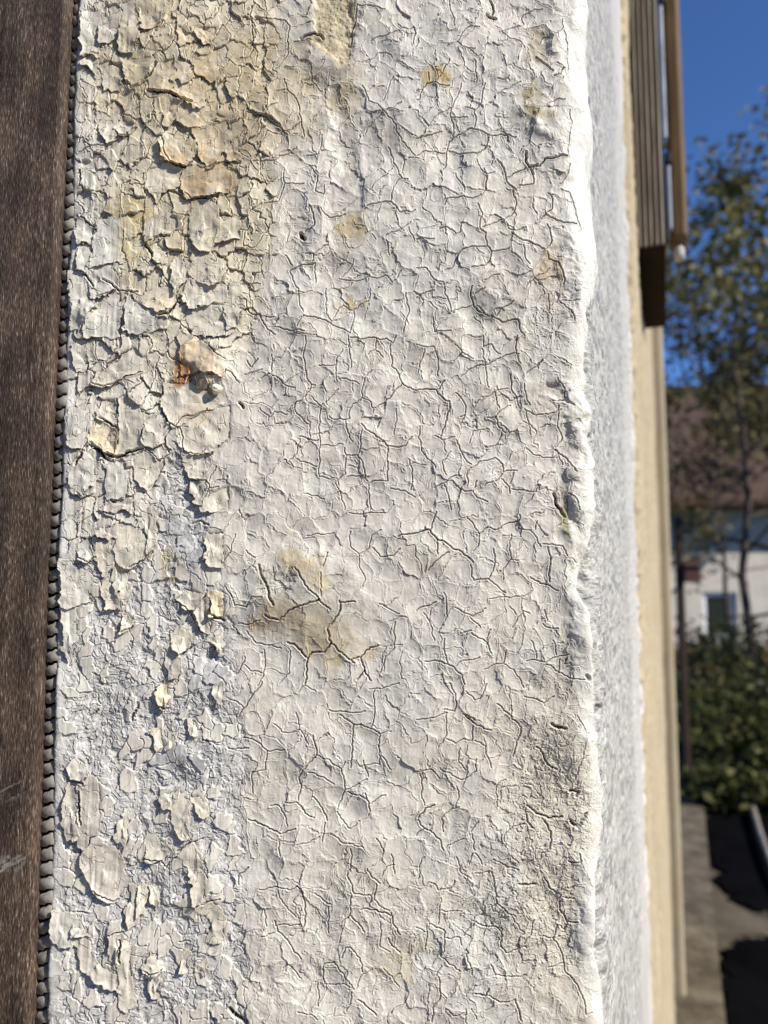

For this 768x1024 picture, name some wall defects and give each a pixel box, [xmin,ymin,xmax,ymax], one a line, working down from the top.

crack [127,65,190,102]
crack [76,443,141,464]
spalling [47,0,249,1024]
crack [96,350,216,524]
corrosion [176,346,207,383]
crack [182,2,578,1021]